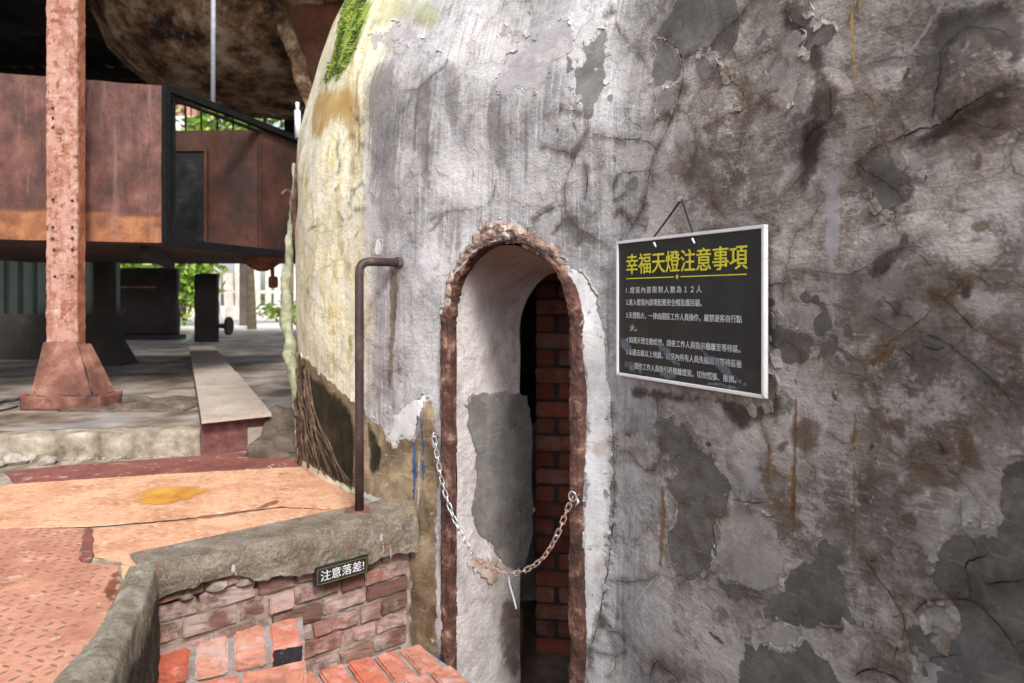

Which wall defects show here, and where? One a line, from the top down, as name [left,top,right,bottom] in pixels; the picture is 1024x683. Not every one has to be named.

flaking render [493,14,620,130]
crack [531,0,788,249]
peeling [648,0,746,120]
damp [784,9,837,186]
crack [799,8,1020,202]
damp [297,373,354,488]
peeling [295,351,440,659]
damp [368,426,381,473]
flaking render [439,217,617,641]
peeling [659,413,881,683]
rust [767,400,820,531]
peeling [897,449,1024,683]